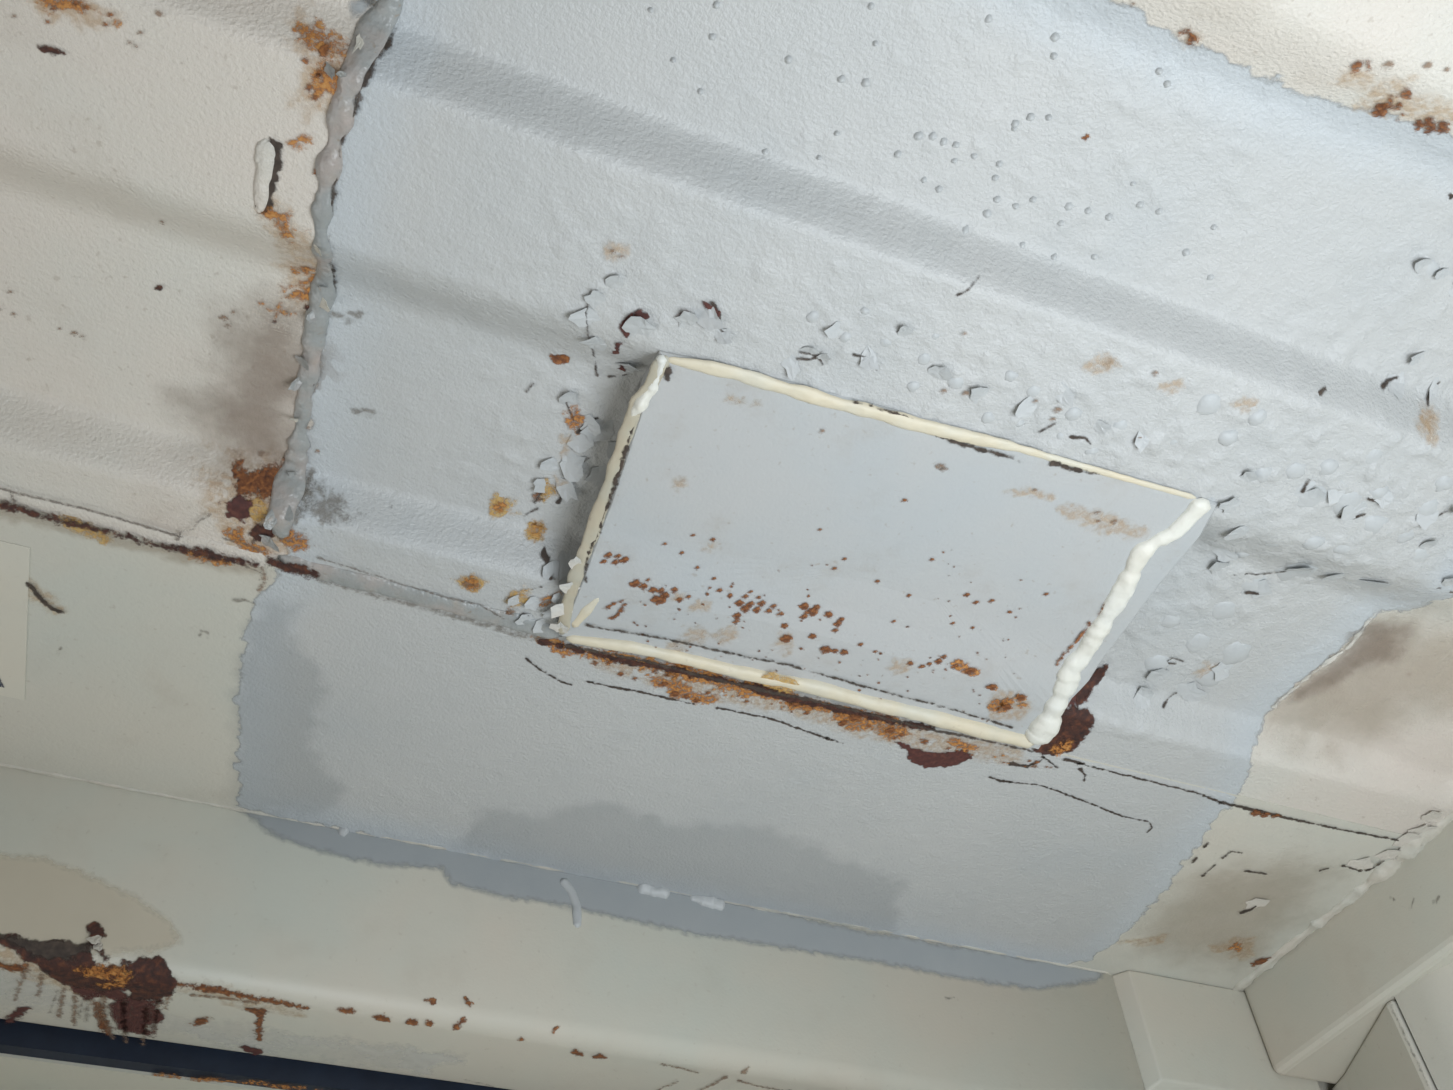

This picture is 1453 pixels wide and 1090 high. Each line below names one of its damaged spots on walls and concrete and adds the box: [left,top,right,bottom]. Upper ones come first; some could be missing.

corrosion [293,17,347,100]
peeling [254,137,283,214]
crack [584,428,634,583]
crack [940,437,1012,459]
crack [1049,461,1097,474]
corrosion [0,451,978,756]
peeling [508,547,582,633]
peeling [896,742,972,768]
crack [525,623,1399,841]
corrosion [907,652,1028,722]
peeling [1033,664,1108,757]
corrosion [0,921,310,1055]